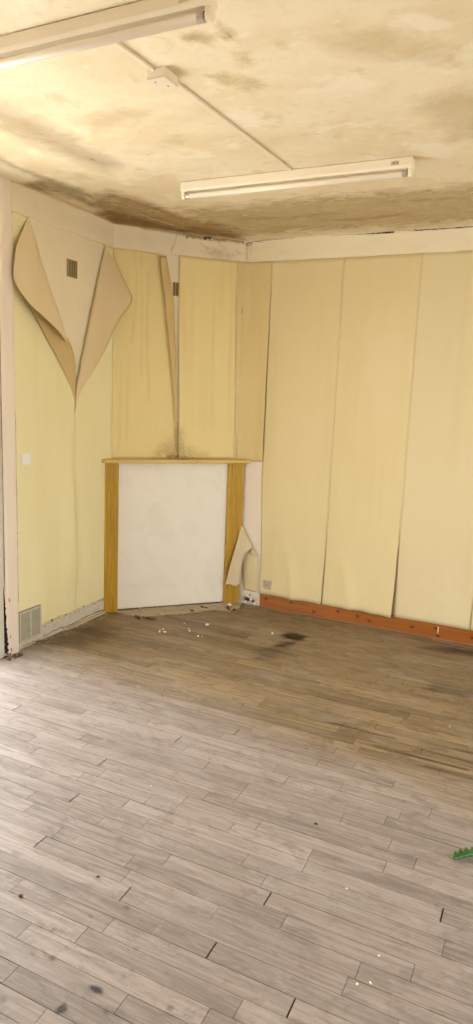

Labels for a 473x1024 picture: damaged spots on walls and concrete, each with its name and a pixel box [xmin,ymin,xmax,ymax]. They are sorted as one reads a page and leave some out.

leakage [97,189,473,243]